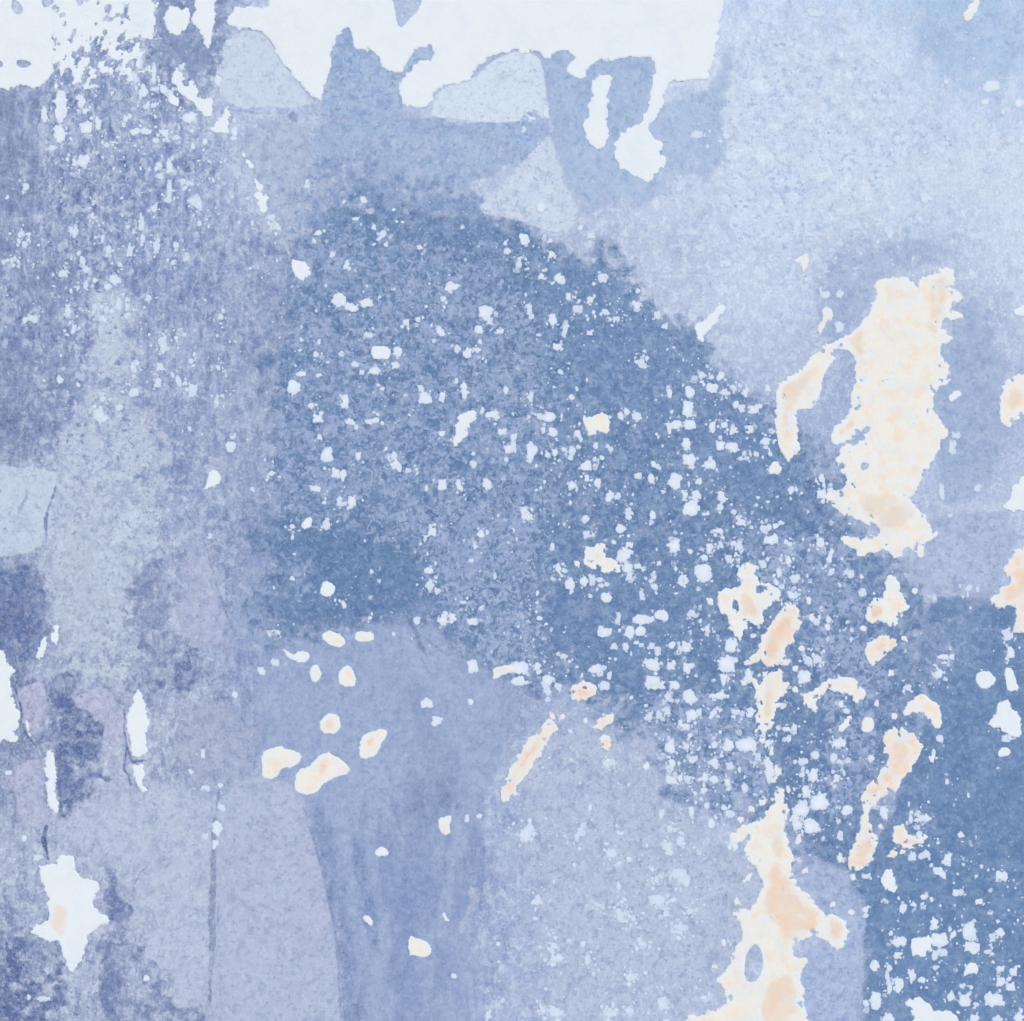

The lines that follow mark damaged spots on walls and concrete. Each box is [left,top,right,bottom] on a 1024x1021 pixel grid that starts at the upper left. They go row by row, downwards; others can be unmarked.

peeling [0,0,735,424]
peeling [225,421,248,453]
peeling [284,200,1024,1021]
peeling [0,649,31,746]
peeling [125,690,150,793]
peeling [261,746,350,795]
peeling [30,854,110,972]